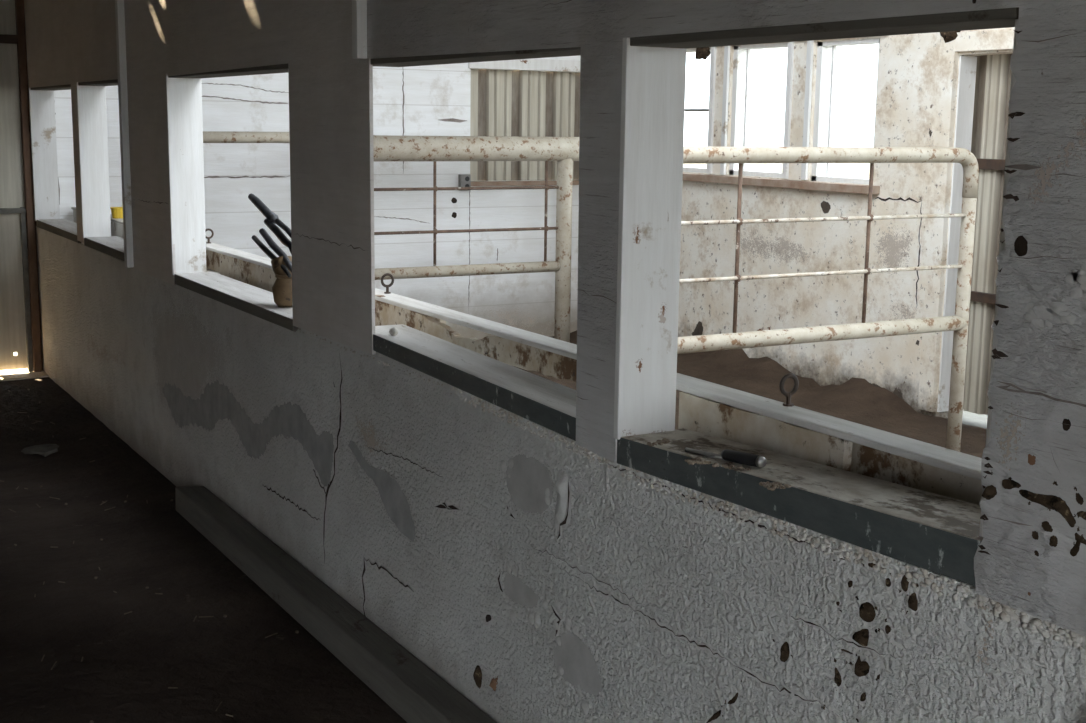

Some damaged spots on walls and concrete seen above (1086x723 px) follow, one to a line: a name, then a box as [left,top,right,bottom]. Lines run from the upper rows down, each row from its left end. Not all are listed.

peeling [162,380,334,486]
crack [263,352,343,564]
crack [368,447,459,511]
flaking render [299,328,1086,650]
crack [361,557,414,616]
crack [496,572,504,592]
crack [531,545,847,723]